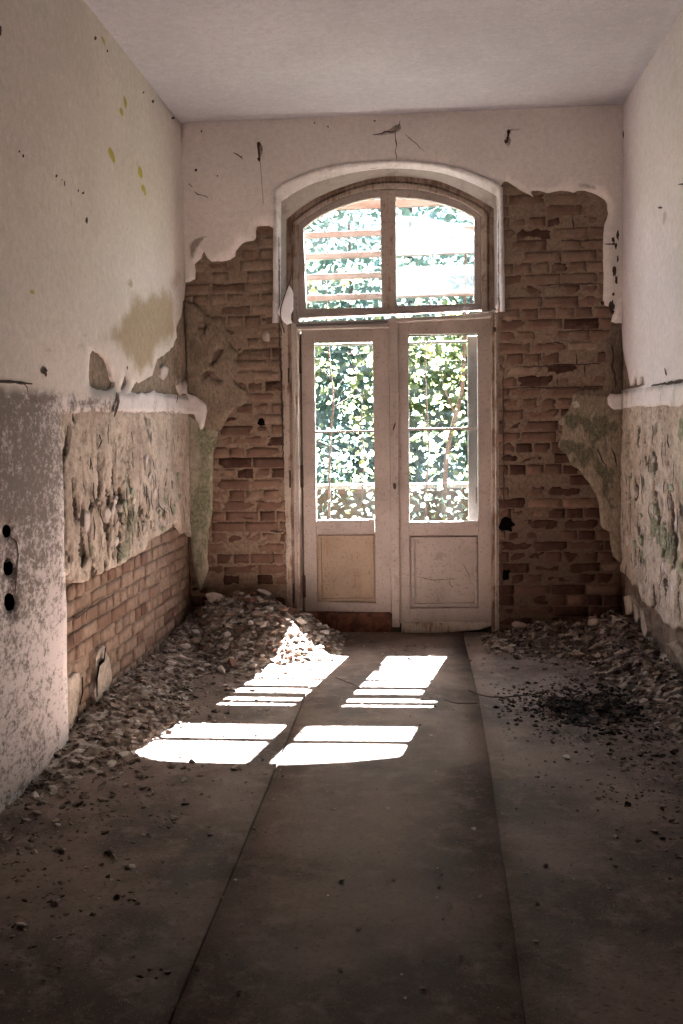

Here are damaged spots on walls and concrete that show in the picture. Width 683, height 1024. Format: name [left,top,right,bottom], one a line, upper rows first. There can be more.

damp [76,236,207,383]
spalling [61,234,287,734]
crack [373,121,424,160]
spalling [497,182,683,676]